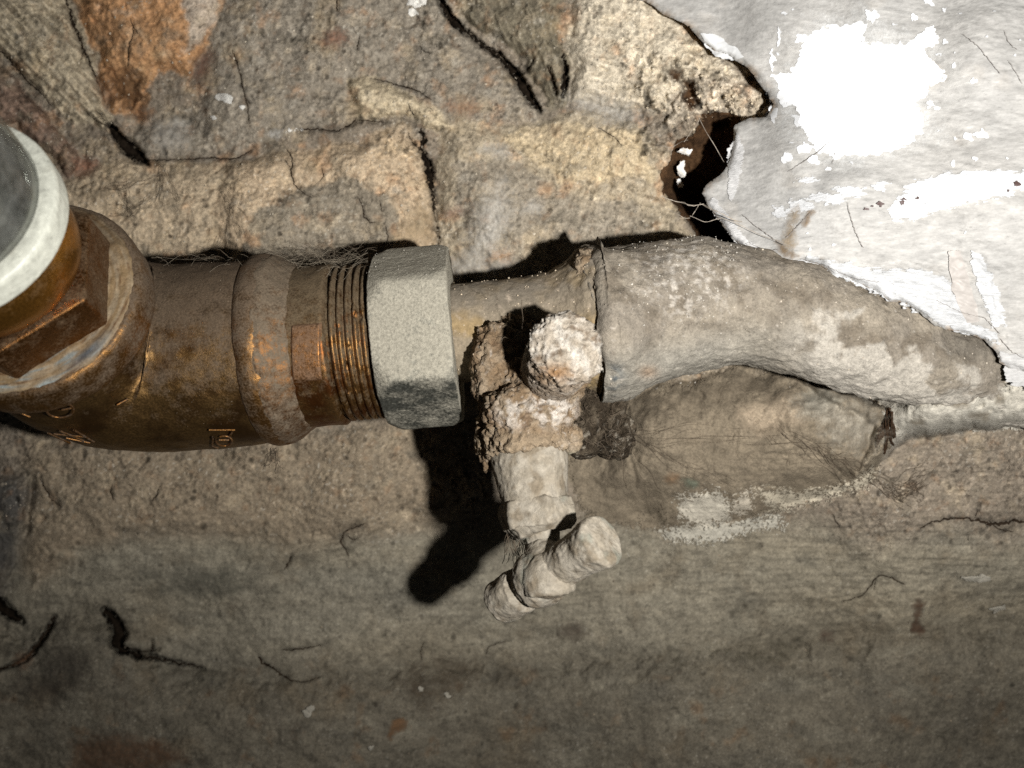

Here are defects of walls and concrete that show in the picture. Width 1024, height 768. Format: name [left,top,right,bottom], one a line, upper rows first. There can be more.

crack [517,52,569,99]
peeling [700,33,744,61]
peeling [768,9,1024,226]
crack [370,78,441,245]
spalling [660,70,757,248]
peeling [798,247,1024,387]
crack [920,510,1024,532]
crack [0,597,22,622]
crack [103,608,203,668]